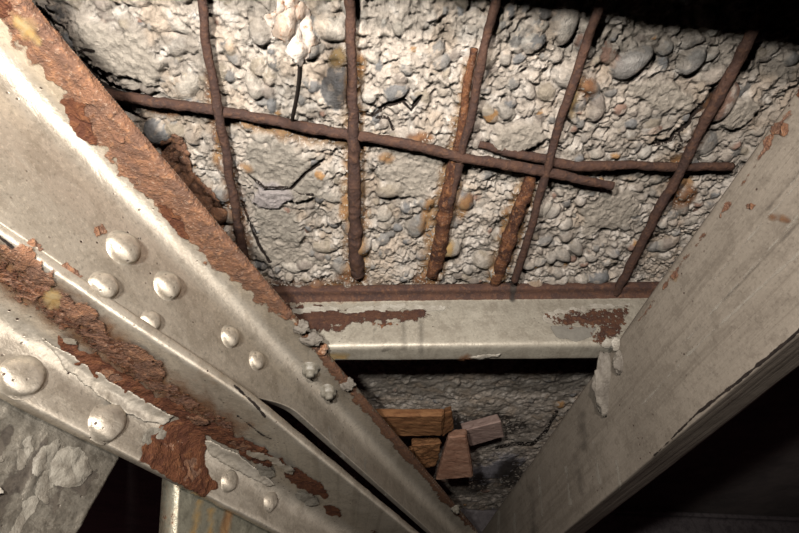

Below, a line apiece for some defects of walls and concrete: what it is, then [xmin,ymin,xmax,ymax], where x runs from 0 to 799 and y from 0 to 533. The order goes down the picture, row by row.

spalling [32,0,799,288]
rust [669,147,697,207]
rust [758,110,792,159]
rust [0,0,471,526]
rust [542,302,630,349]
peeling [42,338,174,425]
crack [654,328,799,456]